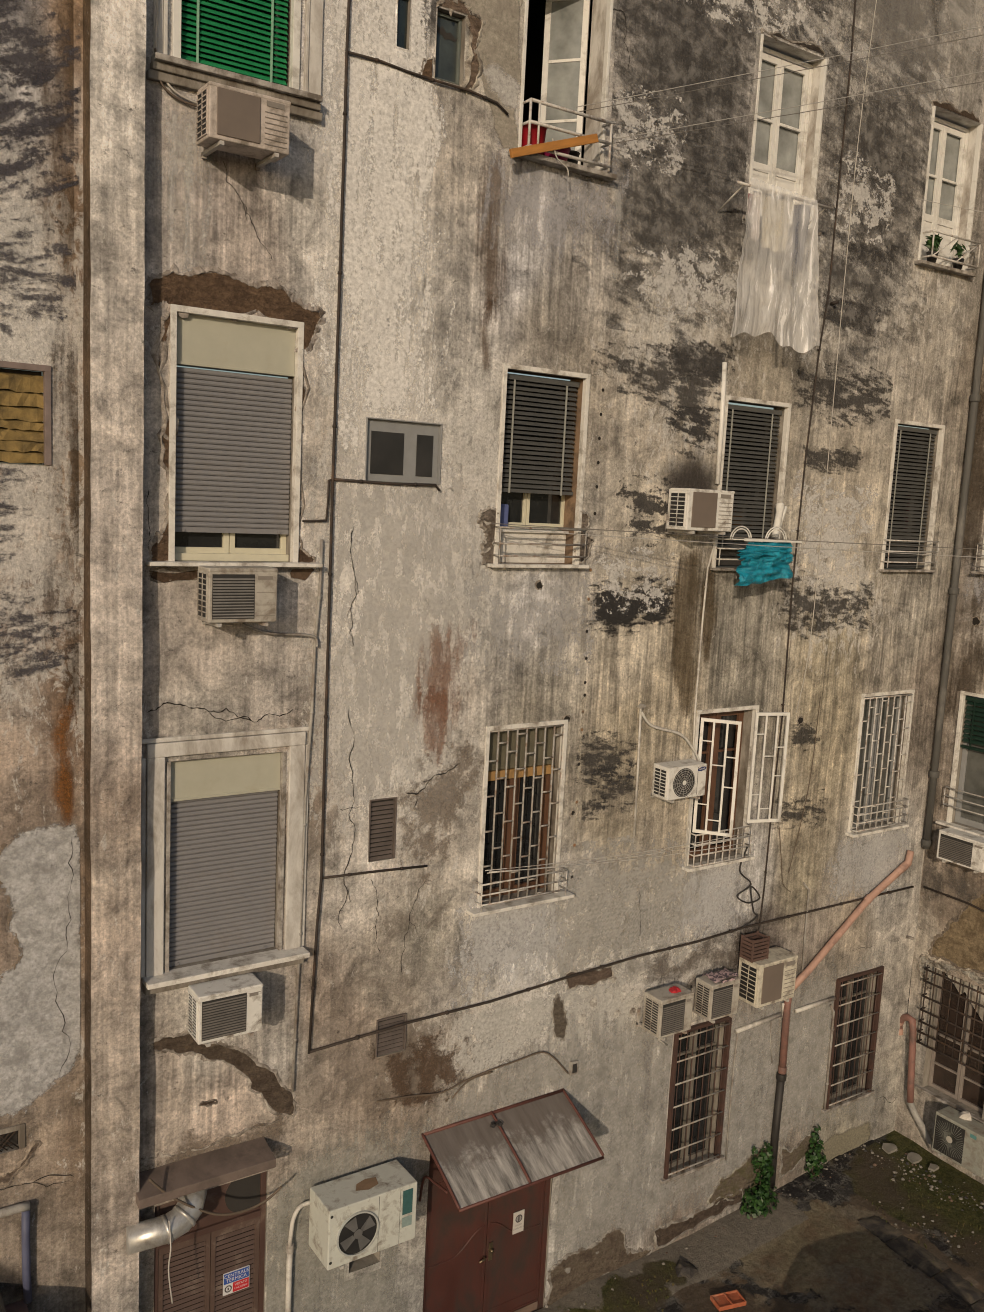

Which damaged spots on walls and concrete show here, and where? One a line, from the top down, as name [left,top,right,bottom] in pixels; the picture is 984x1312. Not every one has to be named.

spalling [436,0,486,95]
damp [587,0,960,459]
rust [54,366,79,545]
spalling [145,263,326,583]
damp [585,474,716,715]
damp [777,445,878,639]
rust [54,639,79,817]
crack [147,702,293,722]
damp [576,731,639,820]
spalling [922,890,984,978]
spalling [139,1030,297,1173]
spalling [544,1131,819,1308]